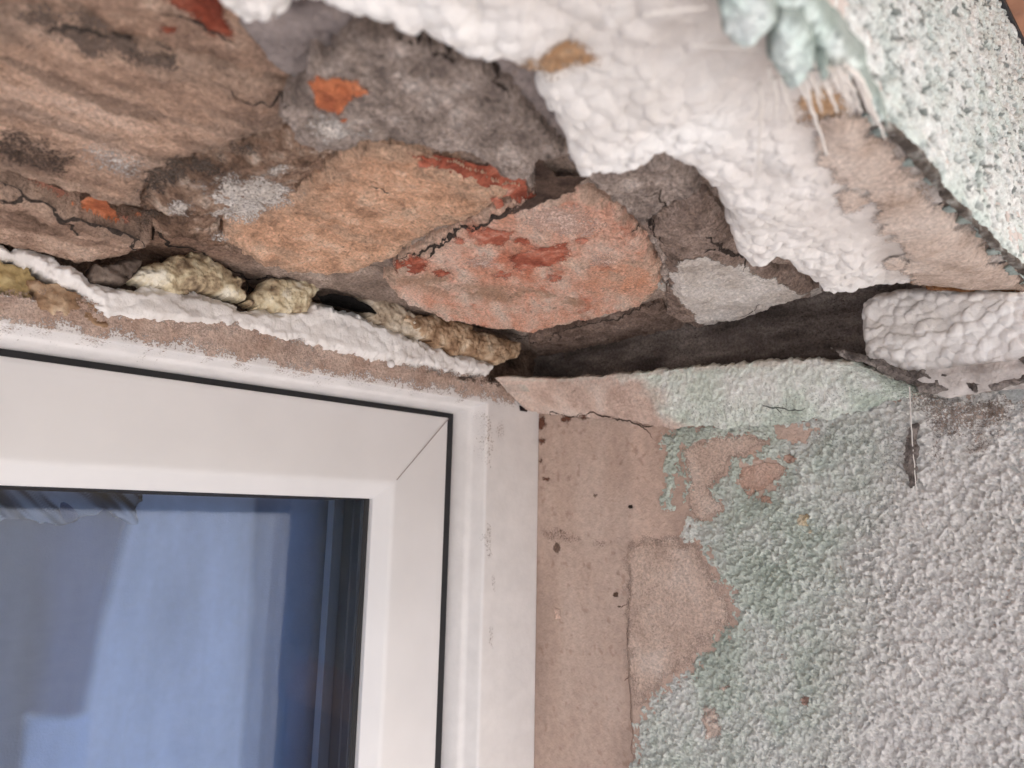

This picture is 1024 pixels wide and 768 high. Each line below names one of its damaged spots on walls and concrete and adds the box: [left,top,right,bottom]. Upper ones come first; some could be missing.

spalling [165,0,235,38]
spalling [308,75,368,123]
spalling [412,154,537,209]
crack [0,181,291,292]
crack [401,207,520,260]
crack [628,189,667,246]
crack [705,237,747,271]
peeling [909,369,949,394]
peeling [966,356,1024,393]
crack [548,411,654,439]
peeling [682,434,796,521]
peeling [613,535,732,705]